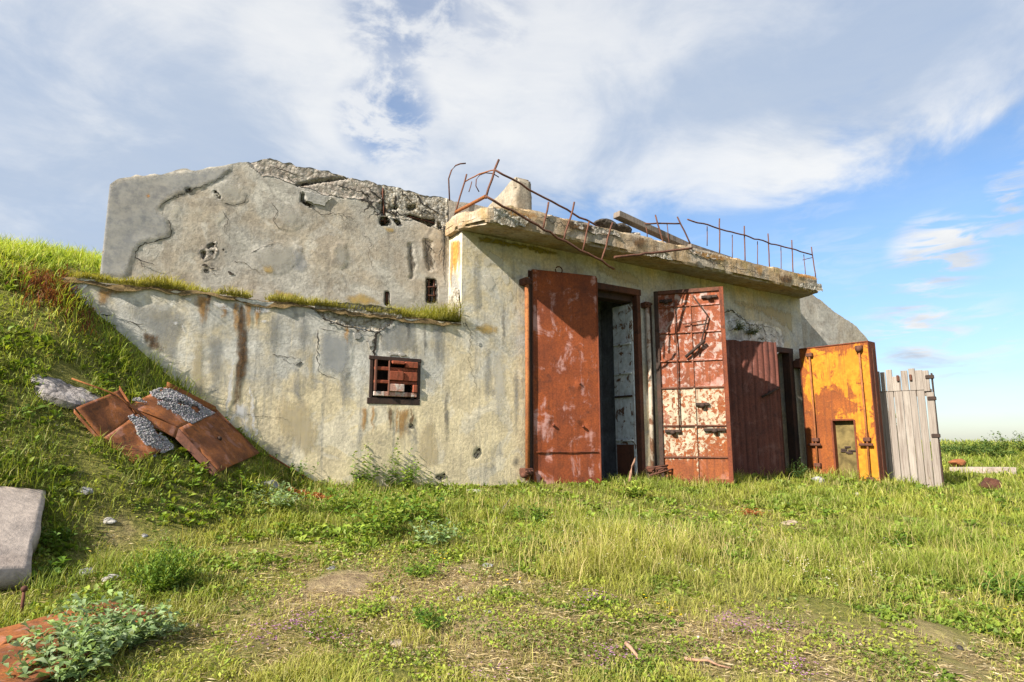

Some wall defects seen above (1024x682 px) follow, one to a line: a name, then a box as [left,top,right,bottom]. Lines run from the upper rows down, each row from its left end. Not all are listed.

flaking render [64,168,228,293]
spalling [198,240,234,275]
spalling [248,158,464,325]
corrosion [450,241,459,280]
spalling [493,206,531,227]
spalling [574,222,620,237]
spalling [646,247,723,260]